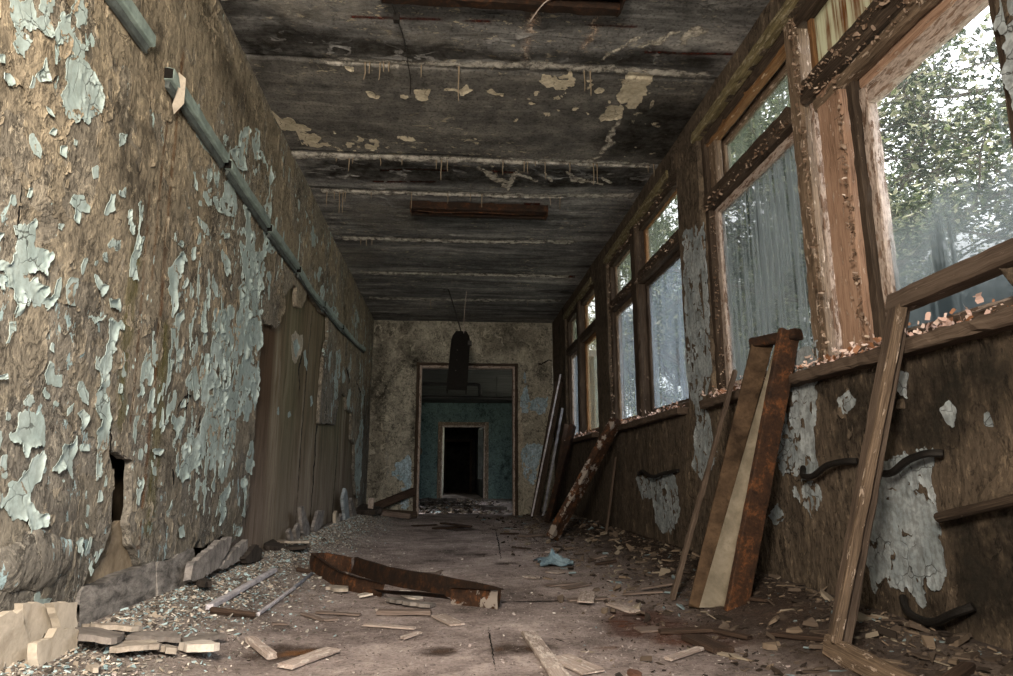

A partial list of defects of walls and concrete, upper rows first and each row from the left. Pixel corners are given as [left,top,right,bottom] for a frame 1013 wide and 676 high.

peeling [993,0,1013,110]
peeling [788,0,921,373]
peeling [0,0,788,604]
peeling [905,292,1013,336]
peeling [896,370,914,416]
peeling [939,400,957,428]
peeling [984,412,994,427]
peeling [766,381,856,588]
peeling [860,446,959,618]